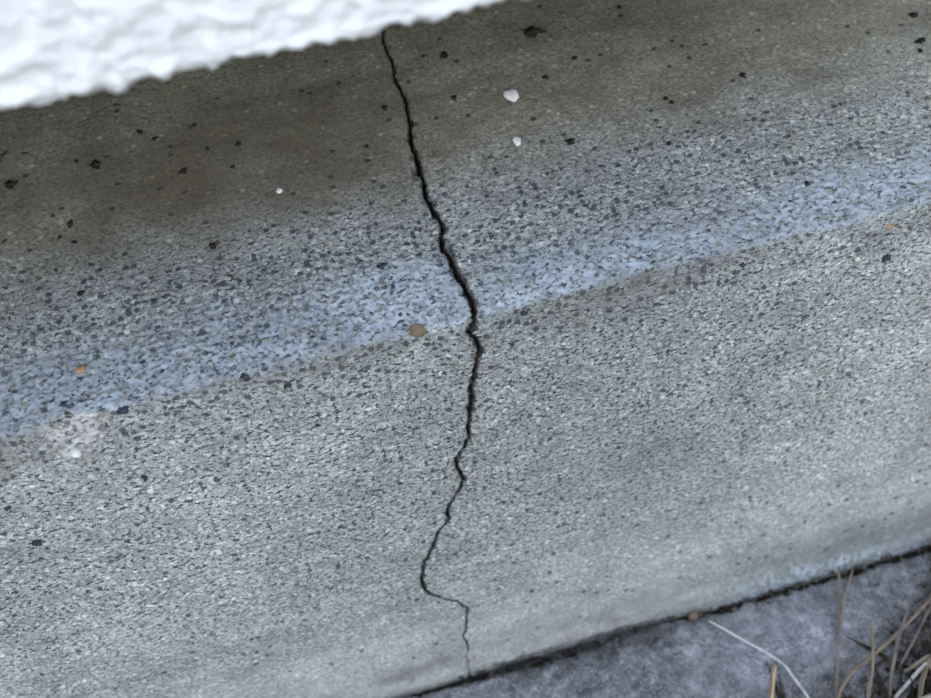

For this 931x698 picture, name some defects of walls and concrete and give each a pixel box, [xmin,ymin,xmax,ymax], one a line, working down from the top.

crack [381,28,931,698]